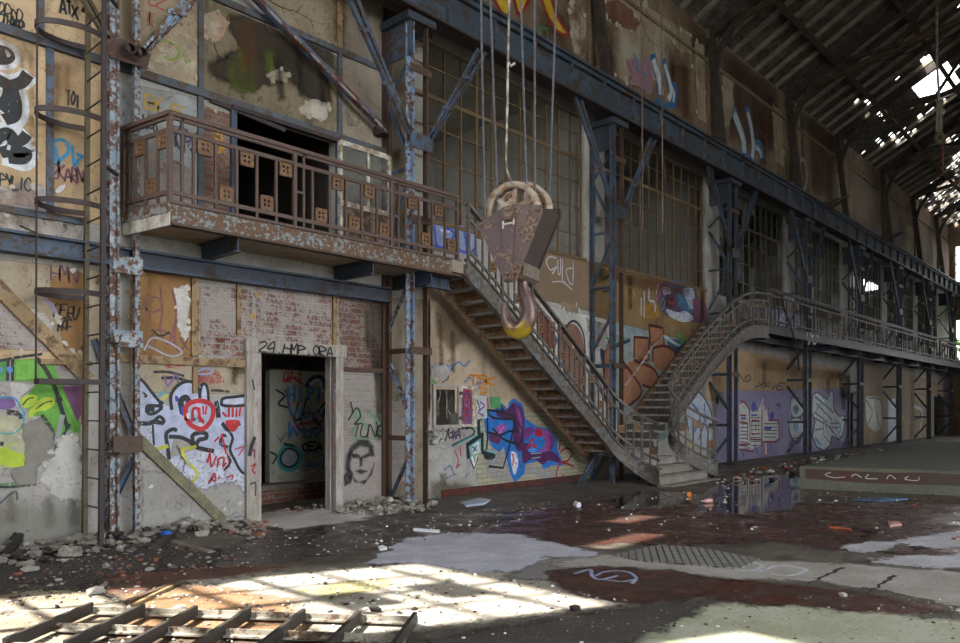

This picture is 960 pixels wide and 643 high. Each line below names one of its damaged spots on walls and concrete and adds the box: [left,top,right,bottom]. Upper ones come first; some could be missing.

water stain [208,15,334,103]
flaking render [297,99,331,122]
flaking render [126,272,381,373]
peeling [11,417,82,502]
crack [807,567,845,585]
crack [868,575,897,593]